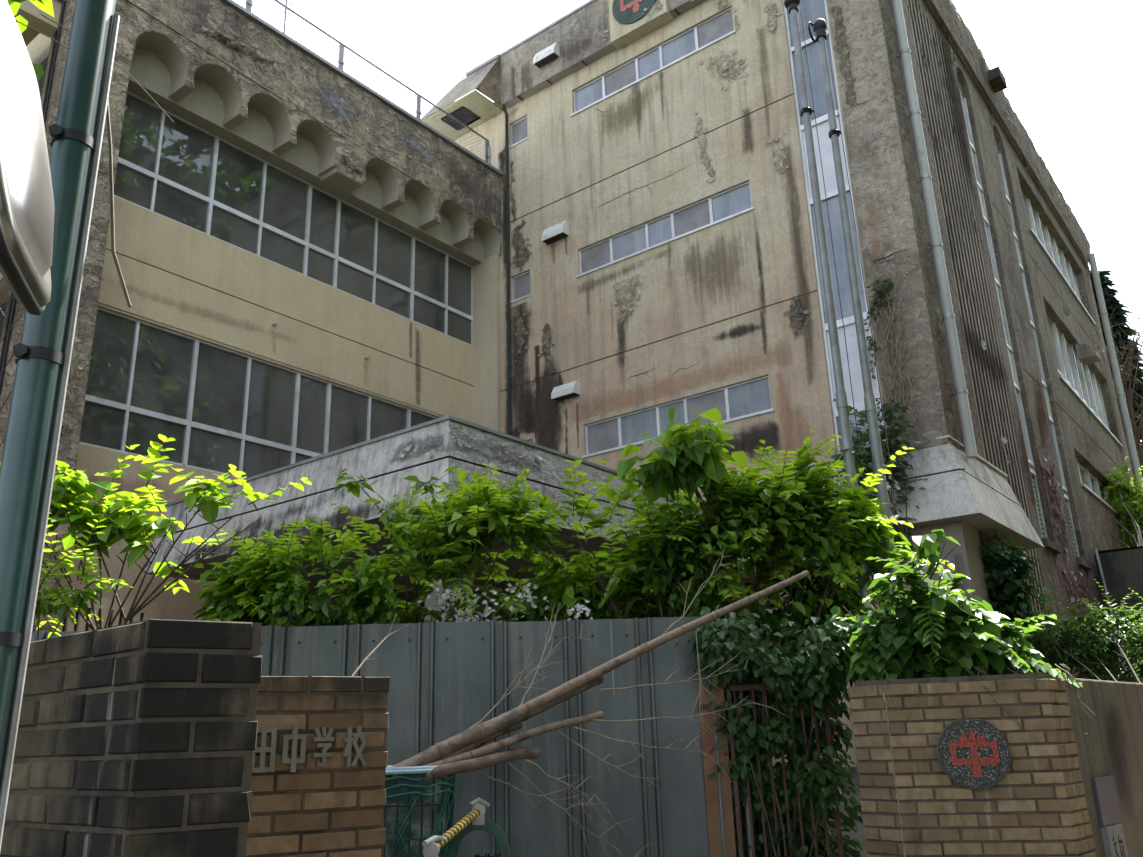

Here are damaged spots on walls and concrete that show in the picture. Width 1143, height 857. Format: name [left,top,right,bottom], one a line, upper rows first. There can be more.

peeling [697,48,749,90]
peeling [693,111,715,182]
water stain [450,148,506,269]
peeling [614,275,644,323]
water stain [717,240,766,353]
water stain [505,302,578,454]
water stain [707,422,779,458]